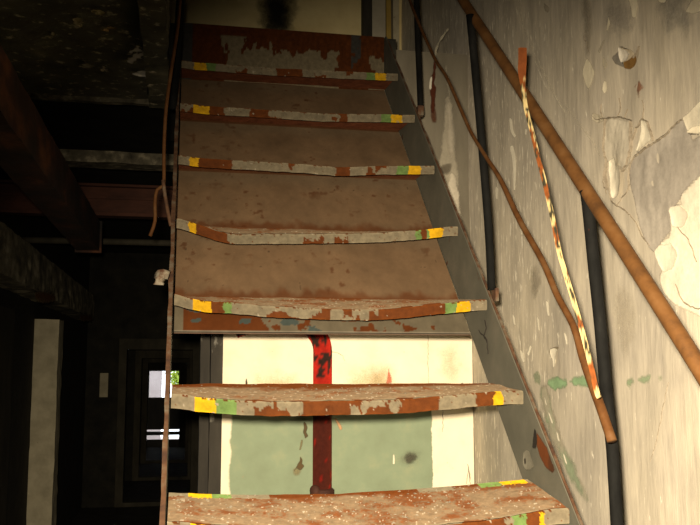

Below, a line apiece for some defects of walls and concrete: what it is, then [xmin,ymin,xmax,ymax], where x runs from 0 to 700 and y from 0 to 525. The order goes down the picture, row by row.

spalling [613,46,640,69]
crack [592,98,654,152]
crack [602,170,650,246]
peeling [627,101,700,316]